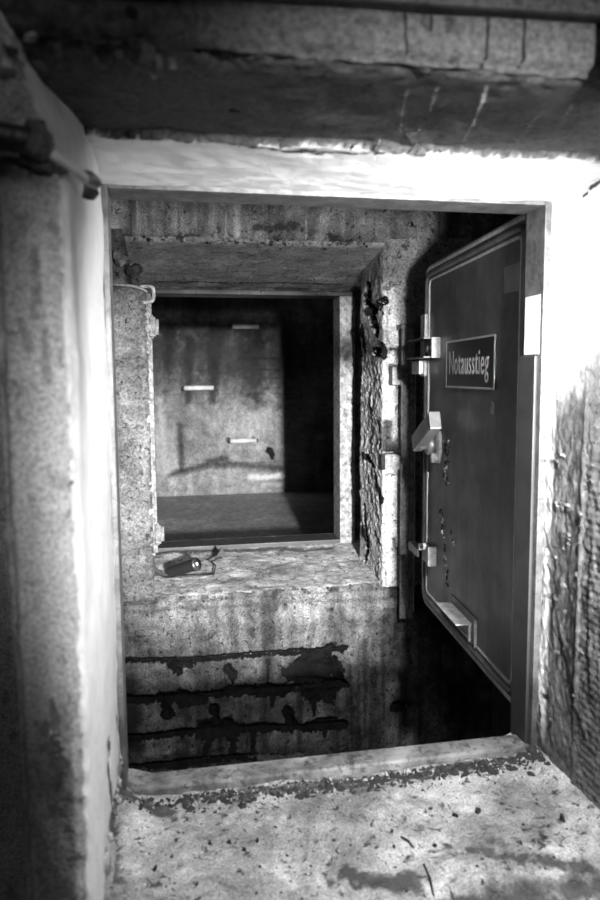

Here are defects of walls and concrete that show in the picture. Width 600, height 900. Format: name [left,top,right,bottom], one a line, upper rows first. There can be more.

spalling [359,281,394,359]
flaking render [362,446,384,505]
flaking render [361,503,370,563]
leakage [126,680,303,764]